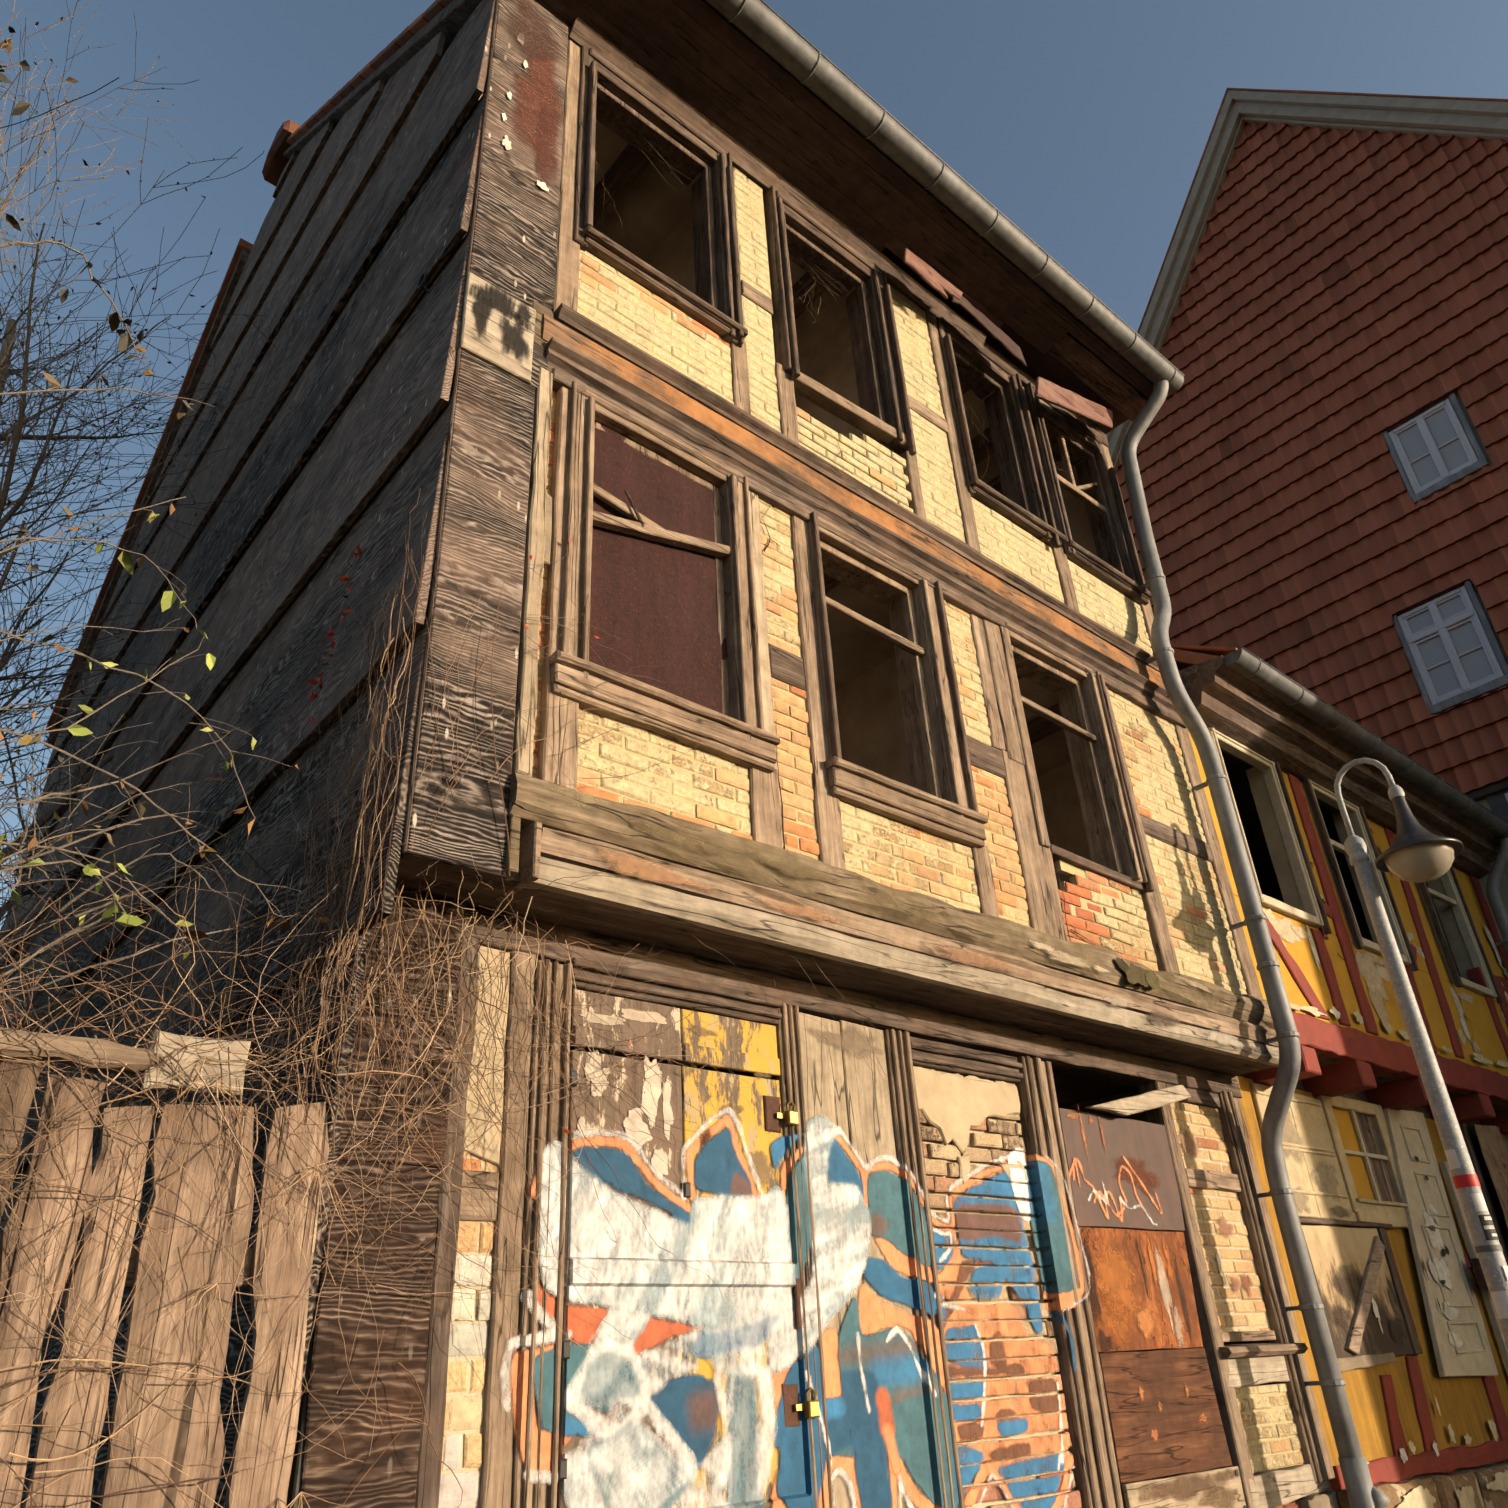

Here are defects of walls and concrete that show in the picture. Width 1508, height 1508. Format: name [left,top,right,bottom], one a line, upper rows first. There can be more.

peeling [580,1008,667,1025]
peeling [690,1026,717,1036]
peeling [584,1050,611,1098]
peeling [577,1116,589,1136]
peeling [623,1055,674,1180]
spalling [913,1066,1020,1184]
peeling [749,1152,771,1184]
spalling [997,1161,1029,1183]
peeling [1422,1203,1463,1348]
peeling [1399,1396,1472,1463]
peeling [1397,1486,1436,1508]
peeling [1456,1470,1508,1508]